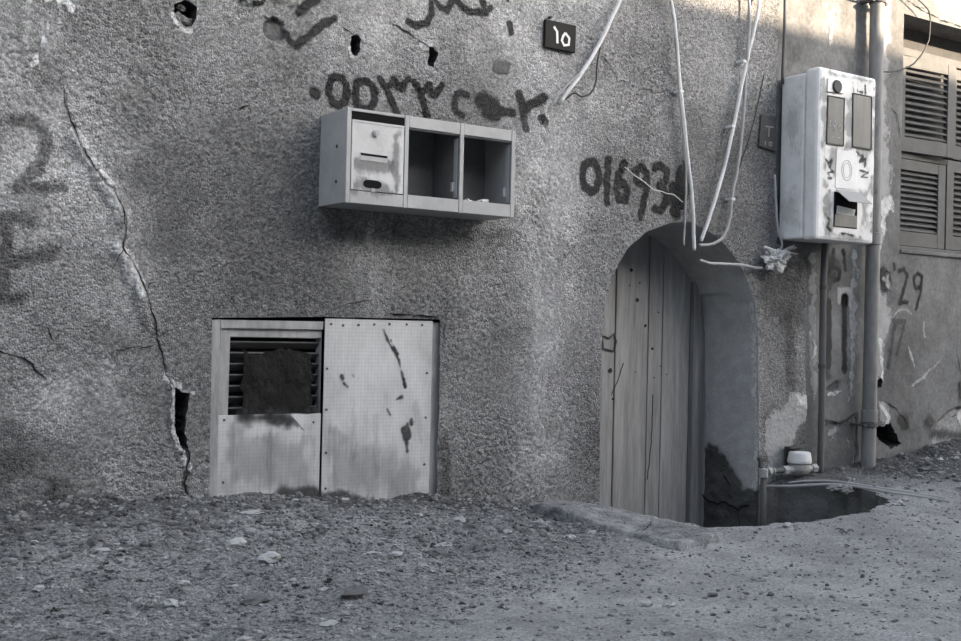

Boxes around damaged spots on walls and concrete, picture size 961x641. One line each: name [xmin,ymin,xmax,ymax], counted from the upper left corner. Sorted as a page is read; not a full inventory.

spalling [171,4,193,34]
crack [59,69,182,390]
crack [0,351,59,382]
spalling [170,382,195,453]
spalling [876,401,901,449]
flaking render [930,408,961,444]
crack [178,449,193,495]